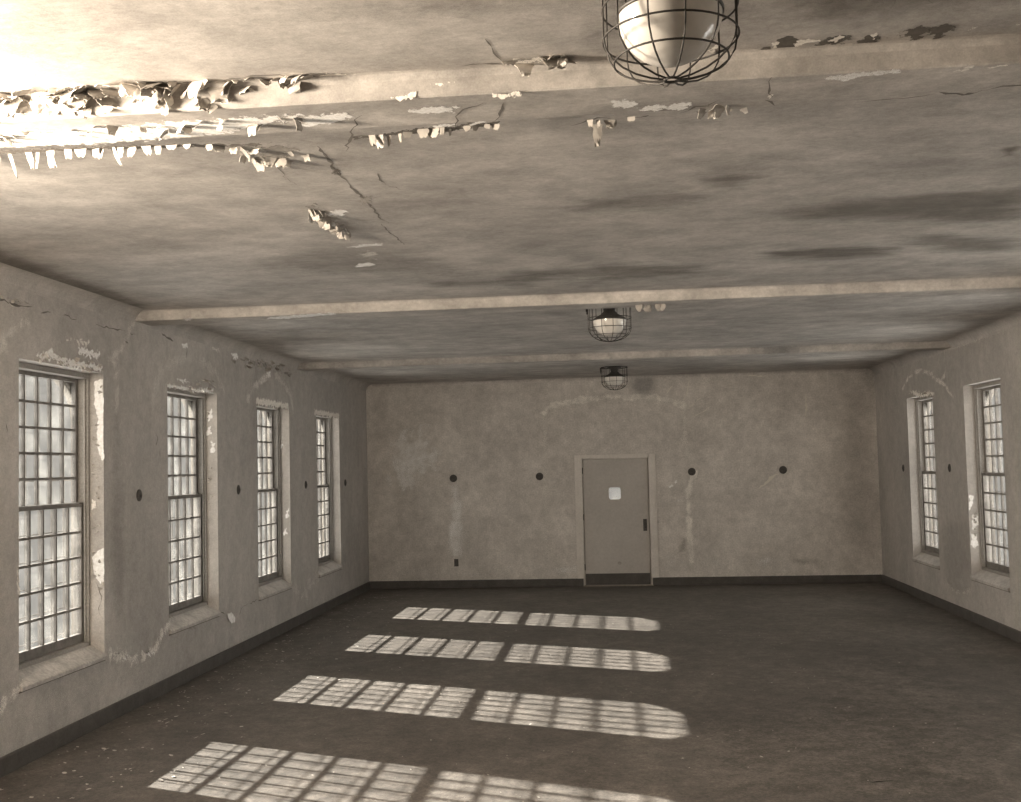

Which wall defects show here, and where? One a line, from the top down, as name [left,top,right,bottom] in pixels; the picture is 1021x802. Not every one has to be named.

peeling [761,33,881,50]
peeling [897,23,956,41]
spalling [0,73,355,182]
peeling [353,91,500,149]
crack [455,103,504,127]
peeling [492,91,521,99]
spalling [572,99,748,147]
crack [863,85,1021,102]
crack [317,115,402,243]
peeling [306,203,383,267]
peeling [35,323,135,479]
peeling [90,545,104,619]